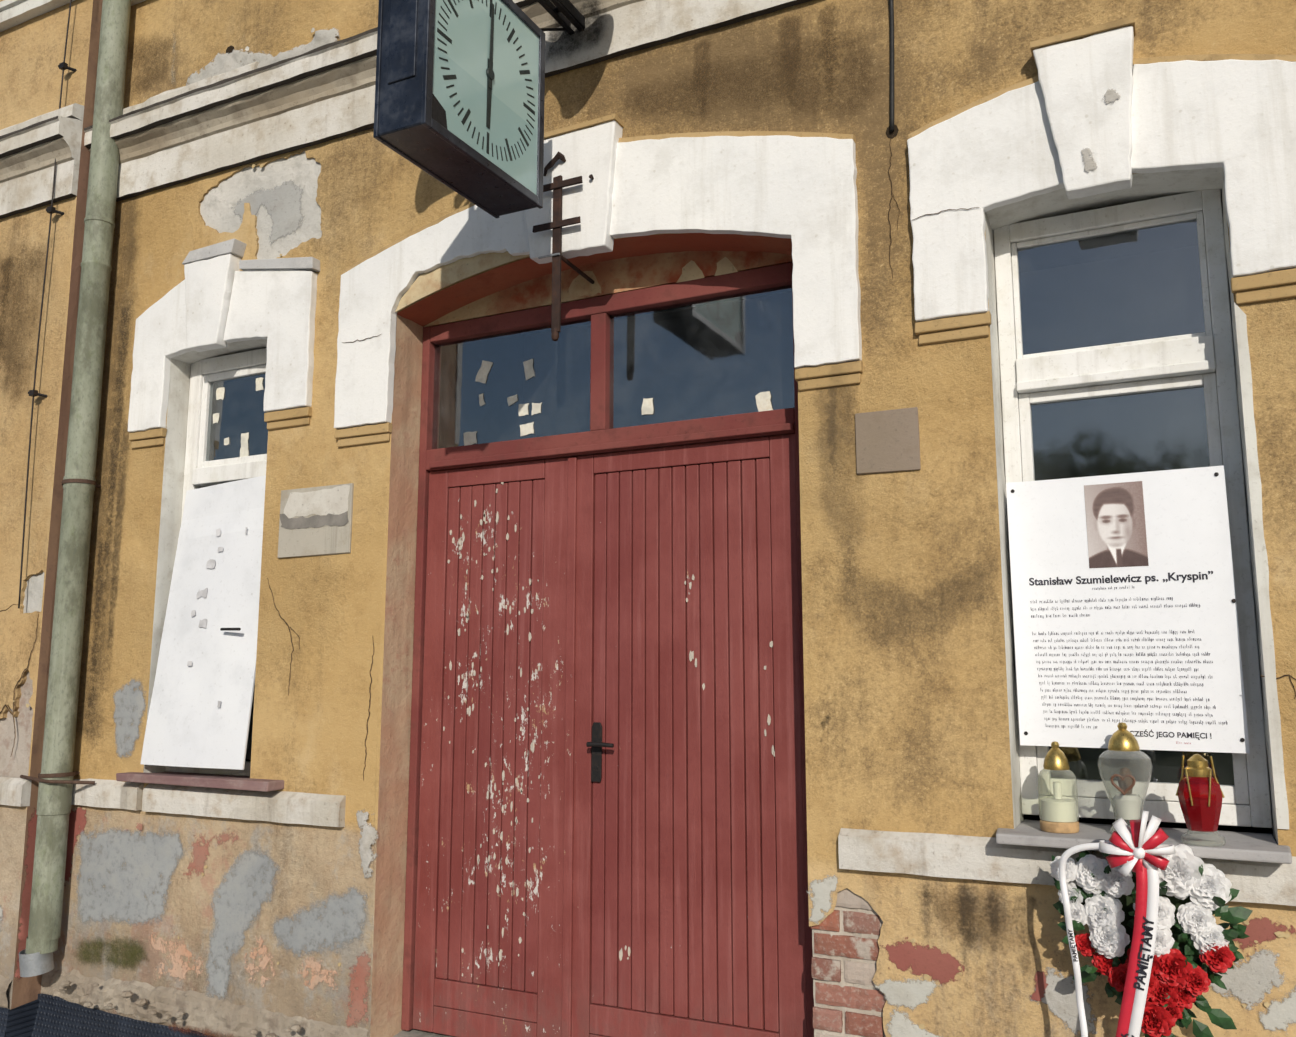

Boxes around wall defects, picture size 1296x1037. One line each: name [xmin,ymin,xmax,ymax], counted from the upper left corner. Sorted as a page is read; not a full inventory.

spalling [186,28,340,86]
peeling [200,151,322,259]
crack [0,604,39,756]
crack [267,578,300,695]
crack [363,641,374,780]
flaking render [811,888,965,1037]
peeling [1230,917,1296,951]